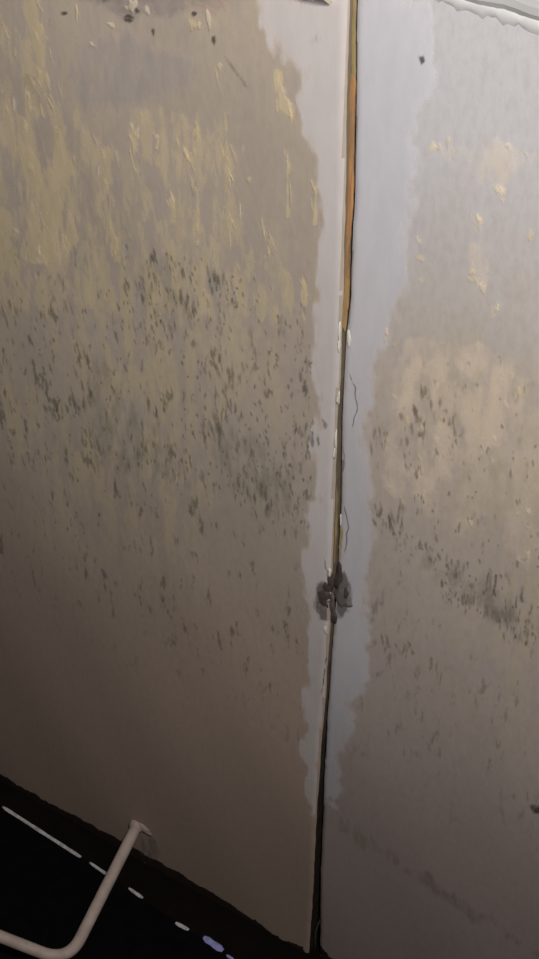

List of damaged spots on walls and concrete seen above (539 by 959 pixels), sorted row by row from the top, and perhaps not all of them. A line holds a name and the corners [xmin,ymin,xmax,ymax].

flaking render [96,0,227,27]
spalling [316,561,353,624]